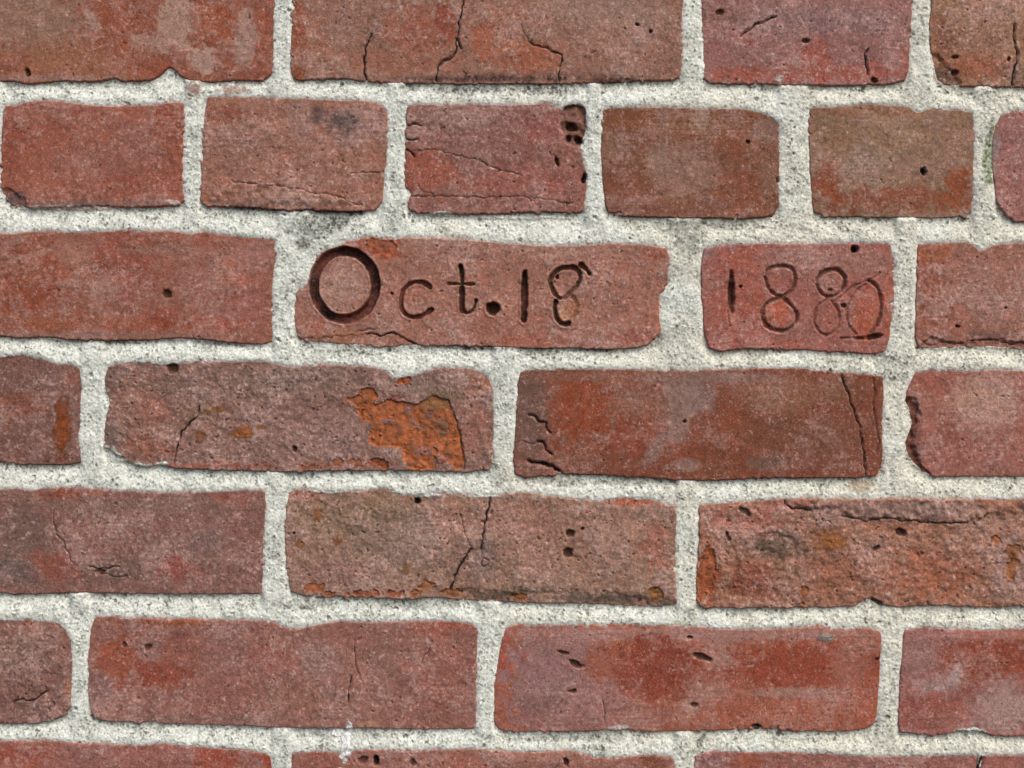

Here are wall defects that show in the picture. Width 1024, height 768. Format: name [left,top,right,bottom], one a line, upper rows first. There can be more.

crack [435,0,464,82]
crack [521,23,563,81]
crack [174,406,200,464]
spalling [332,376,465,472]
crack [523,415,560,472]
crack [841,376,880,475]
crack [450,500,490,590]